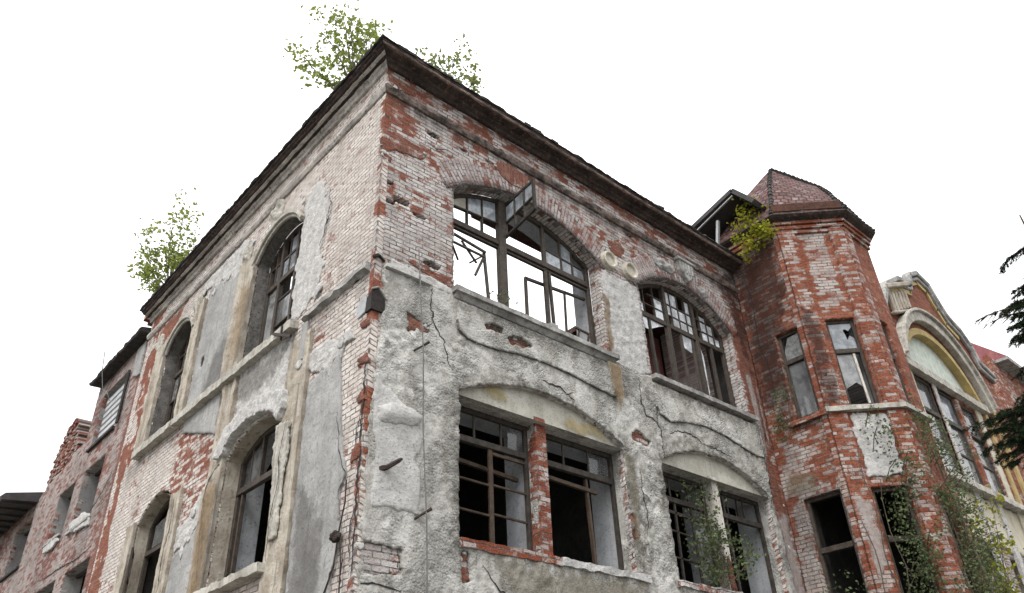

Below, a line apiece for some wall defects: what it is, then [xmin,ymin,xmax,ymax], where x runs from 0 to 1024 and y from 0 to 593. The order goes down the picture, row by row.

spalling [380,130,426,162]
spalling [406,259,454,288]
spalling [407,314,430,333]
crack [425,290,451,367]
spalling [485,324,531,349]
flaking render [211,317,371,542]
spalling [632,430,649,447]
crack [639,380,729,458]
spalling [356,539,400,575]